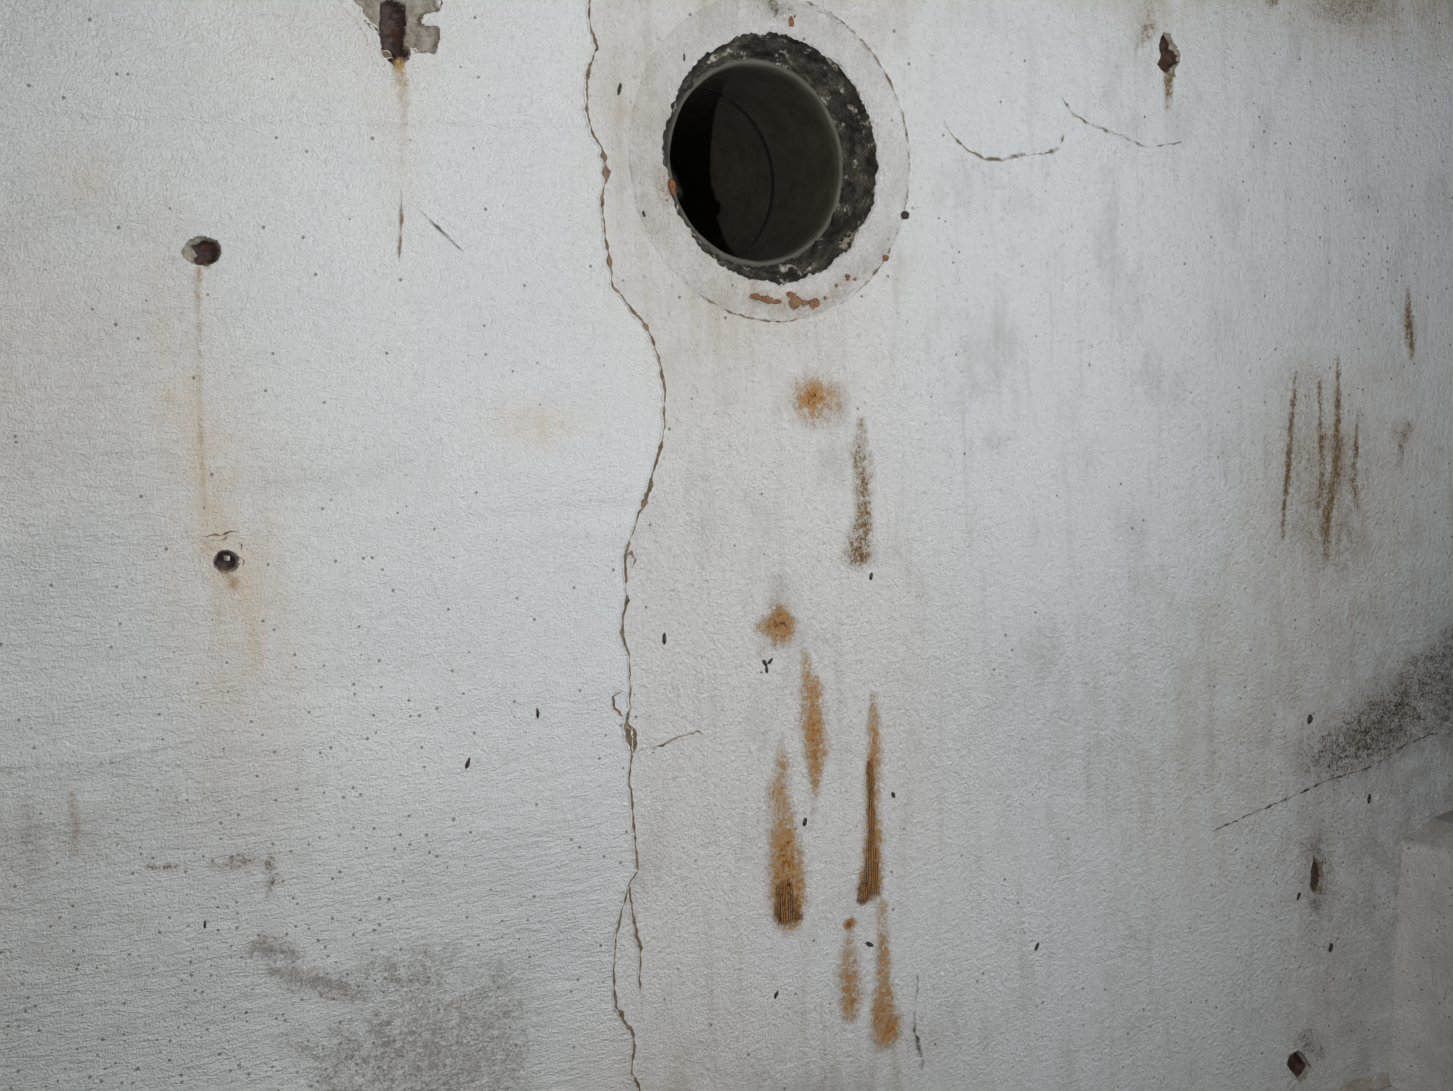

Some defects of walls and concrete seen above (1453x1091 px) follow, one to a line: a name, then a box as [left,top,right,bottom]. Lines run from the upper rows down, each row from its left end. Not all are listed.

spalling [339,0,452,86]
crack [806,1,910,275]
crack [945,98,1181,161]
crack [582,0,704,1091]
rust [845,420,872,566]
rust [801,656,828,794]
water stain [1307,628,1453,781]
rust [770,756,806,930]
rust [841,695,901,1048]
water stain [251,937,362,1000]
water stain [298,950,525,1091]
spalling [1280,1034,1324,1091]